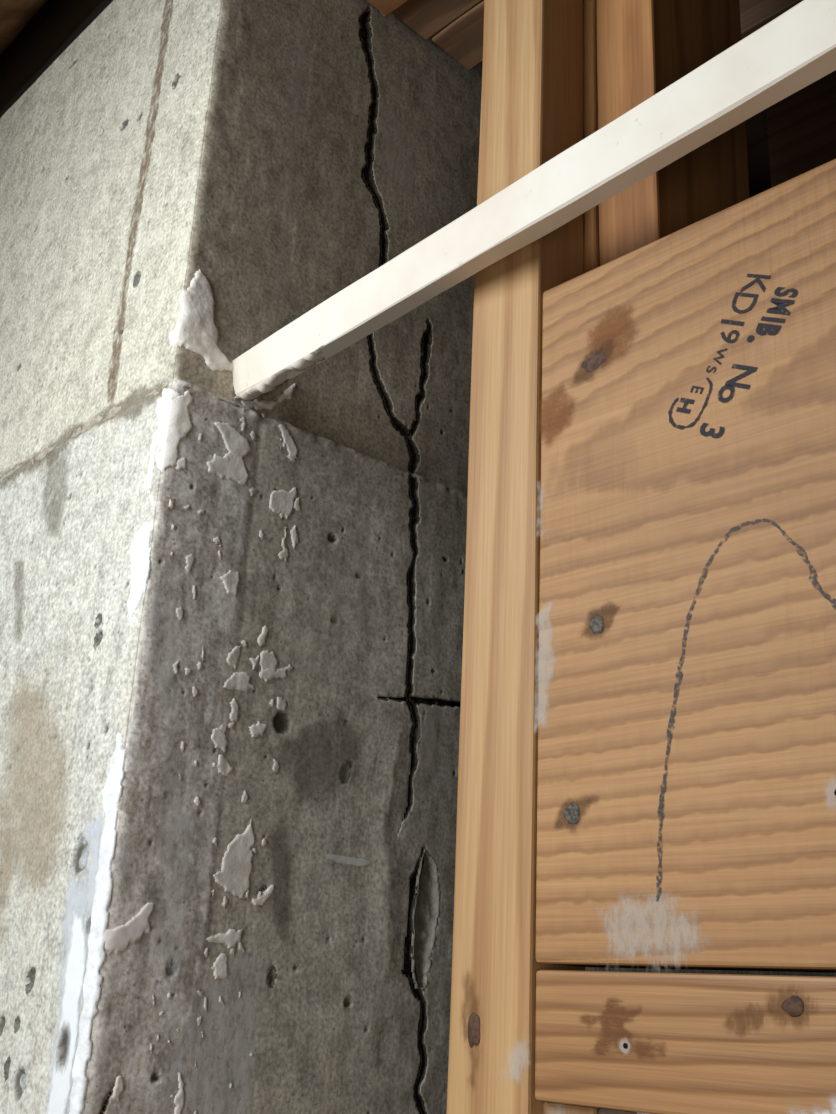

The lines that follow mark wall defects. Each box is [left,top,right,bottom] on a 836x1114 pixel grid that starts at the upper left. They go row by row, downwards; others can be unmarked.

crack [359,9,388,267]
peeling [143,388,205,514]
peeling [207,400,301,562]
damp [126,521,177,704]
peeling [171,552,196,599]
peeling [172,646,205,697]
peeling [219,570,240,597]
peeling [211,625,294,776]
crack [367,322,461,832]
damp [46,733,126,1114]
crack [402,849,426,1114]
crack [100,1082,116,1114]